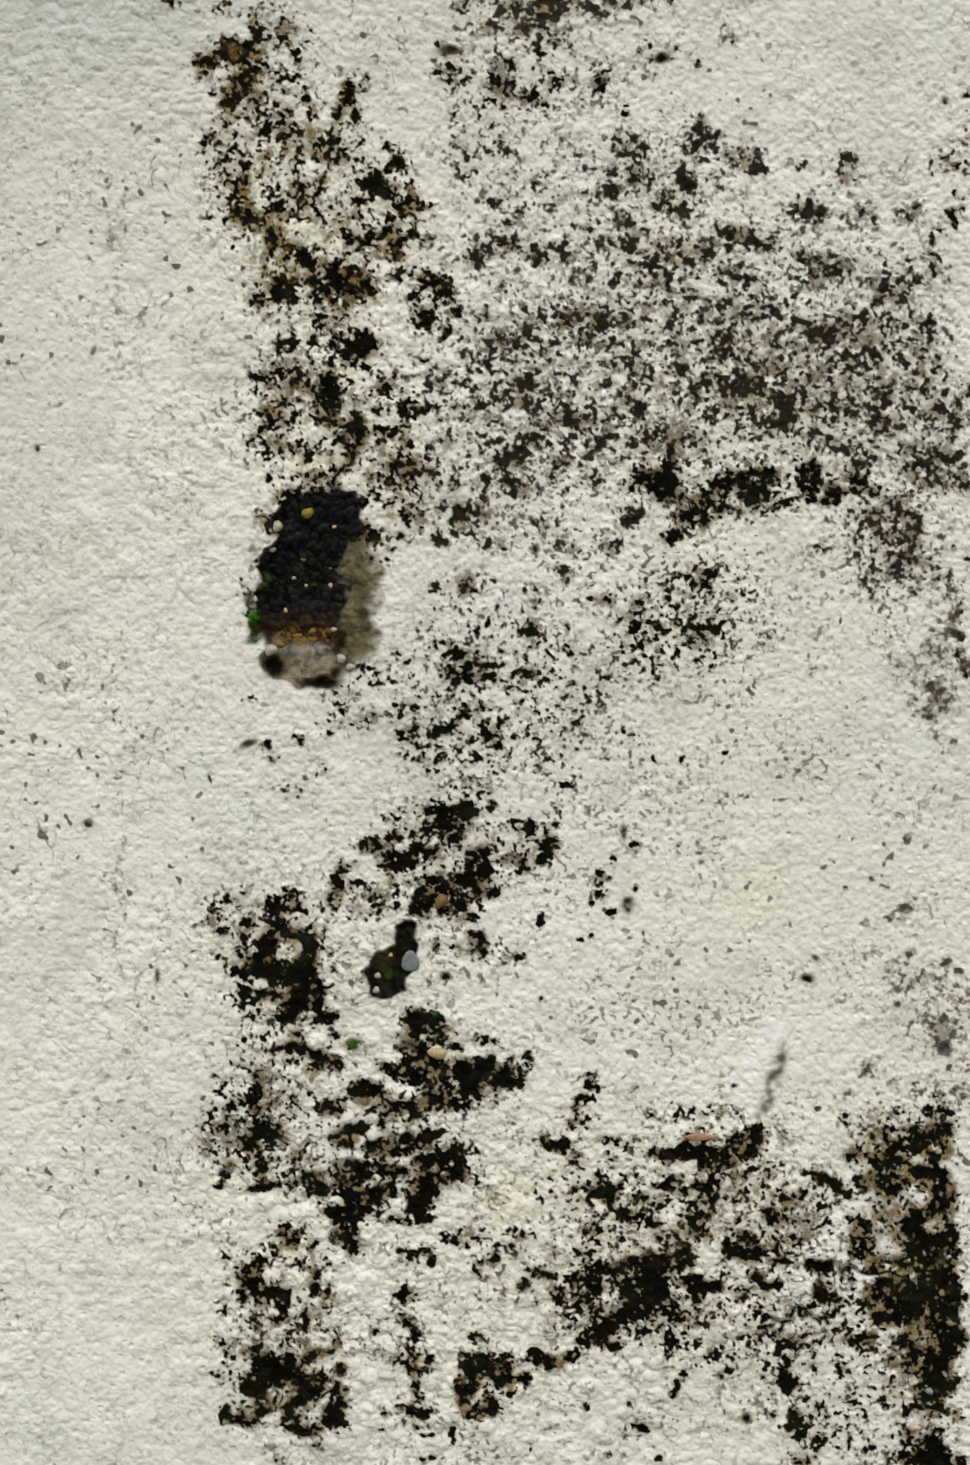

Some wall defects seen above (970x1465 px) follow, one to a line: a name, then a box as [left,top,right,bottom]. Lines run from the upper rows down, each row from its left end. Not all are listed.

spalling [248,486,383,689]
leakage [191,0,970,753]
leakage [195,558,970,1465]